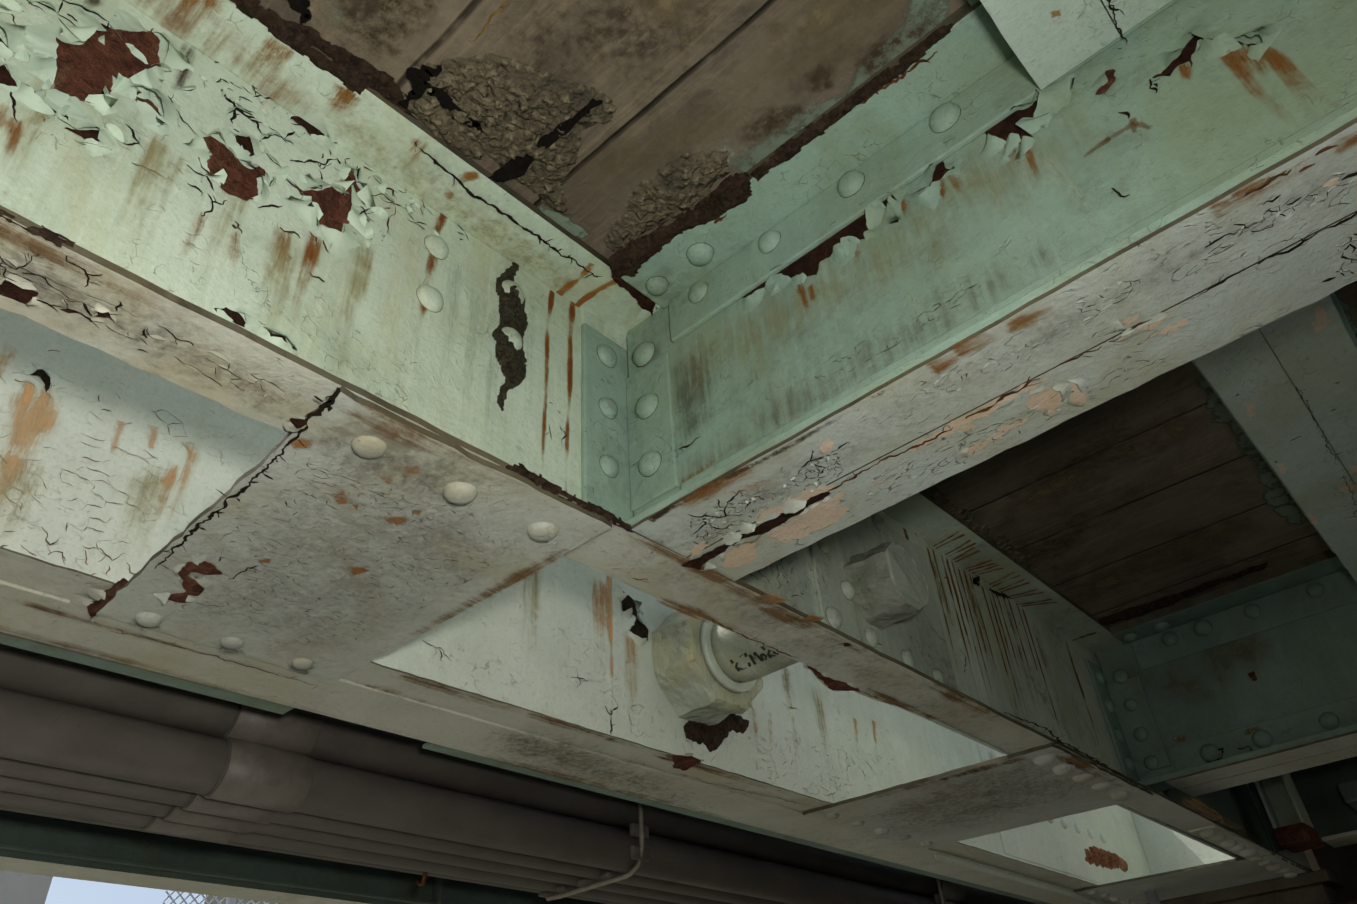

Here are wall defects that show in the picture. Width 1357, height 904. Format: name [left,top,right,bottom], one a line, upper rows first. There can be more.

peeling [0,1,195,157]
leakage [716,65,833,164]
leakage [859,25,924,73]
crack [1107,0,1127,49]
rust [1222,47,1296,94]
peeling [182,124,376,259]
crack [0,252,515,660]
peeling [909,377,1089,458]
peeling [681,485,851,571]
crack [112,628,317,689]
rust [927,531,1057,720]
rust [683,714,771,752]